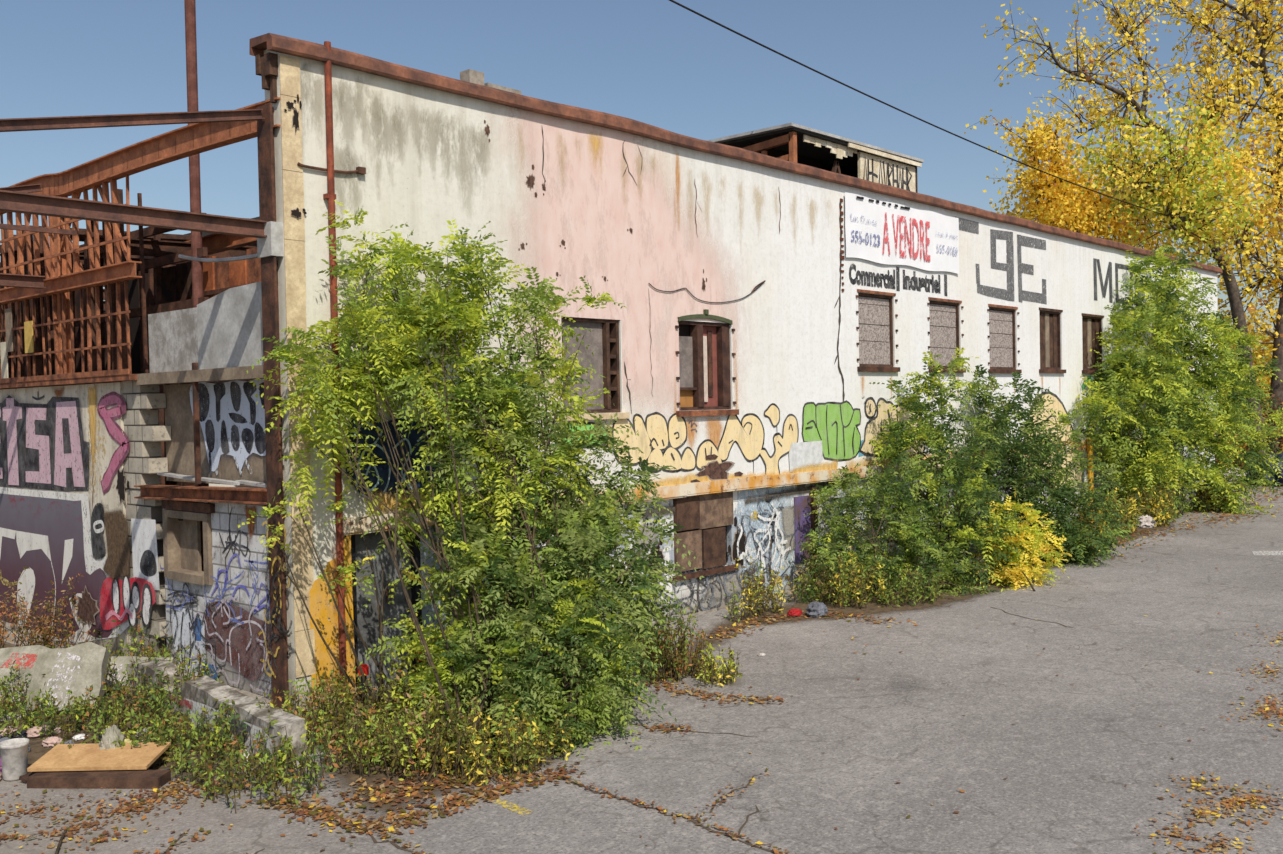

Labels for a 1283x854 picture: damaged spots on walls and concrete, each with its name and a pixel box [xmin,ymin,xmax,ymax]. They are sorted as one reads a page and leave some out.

spalling [284,95,302,134]
crack [834,198,845,413]
rust [636,474,712,489]
rust [728,449,986,479]